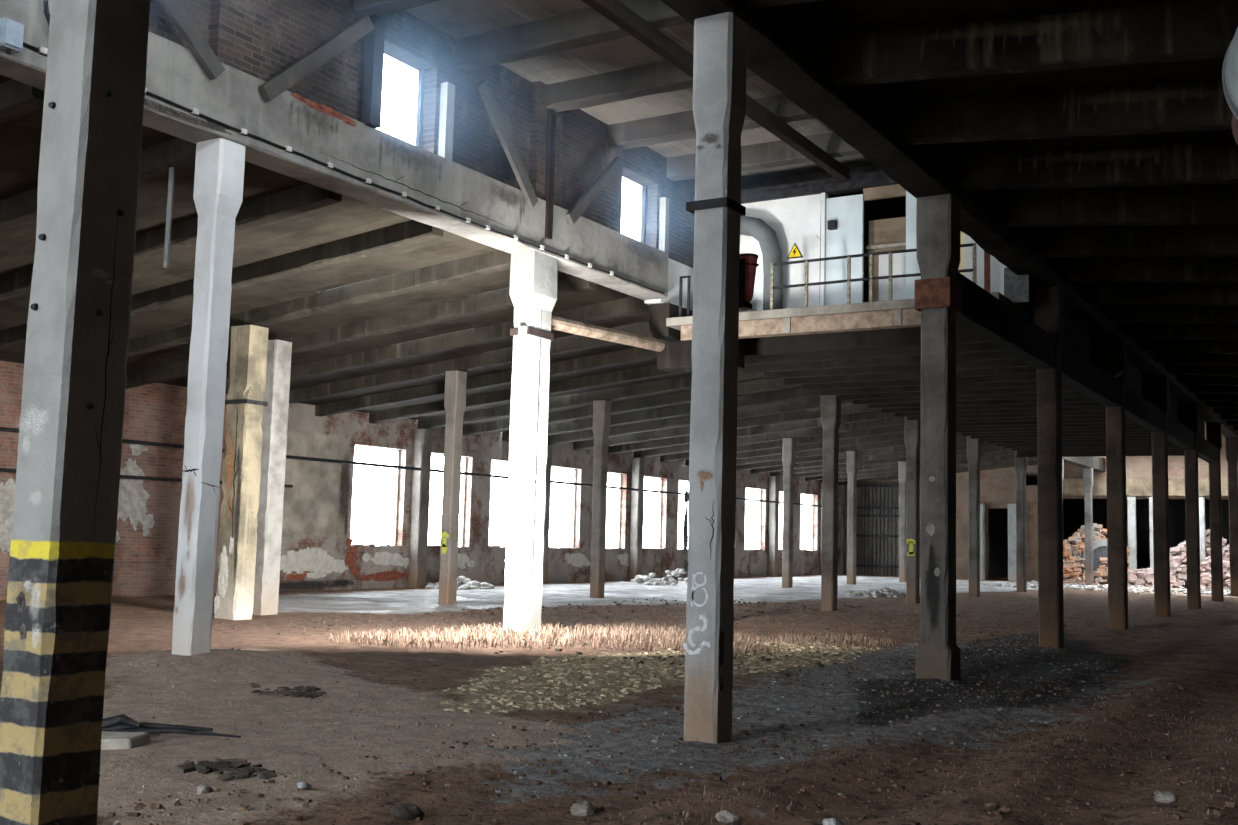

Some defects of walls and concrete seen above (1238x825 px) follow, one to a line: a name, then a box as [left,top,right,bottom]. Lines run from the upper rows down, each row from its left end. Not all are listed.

peeling [0,478,15,555]
peeling [116,444,155,542]
peeling [280,538,409,581]